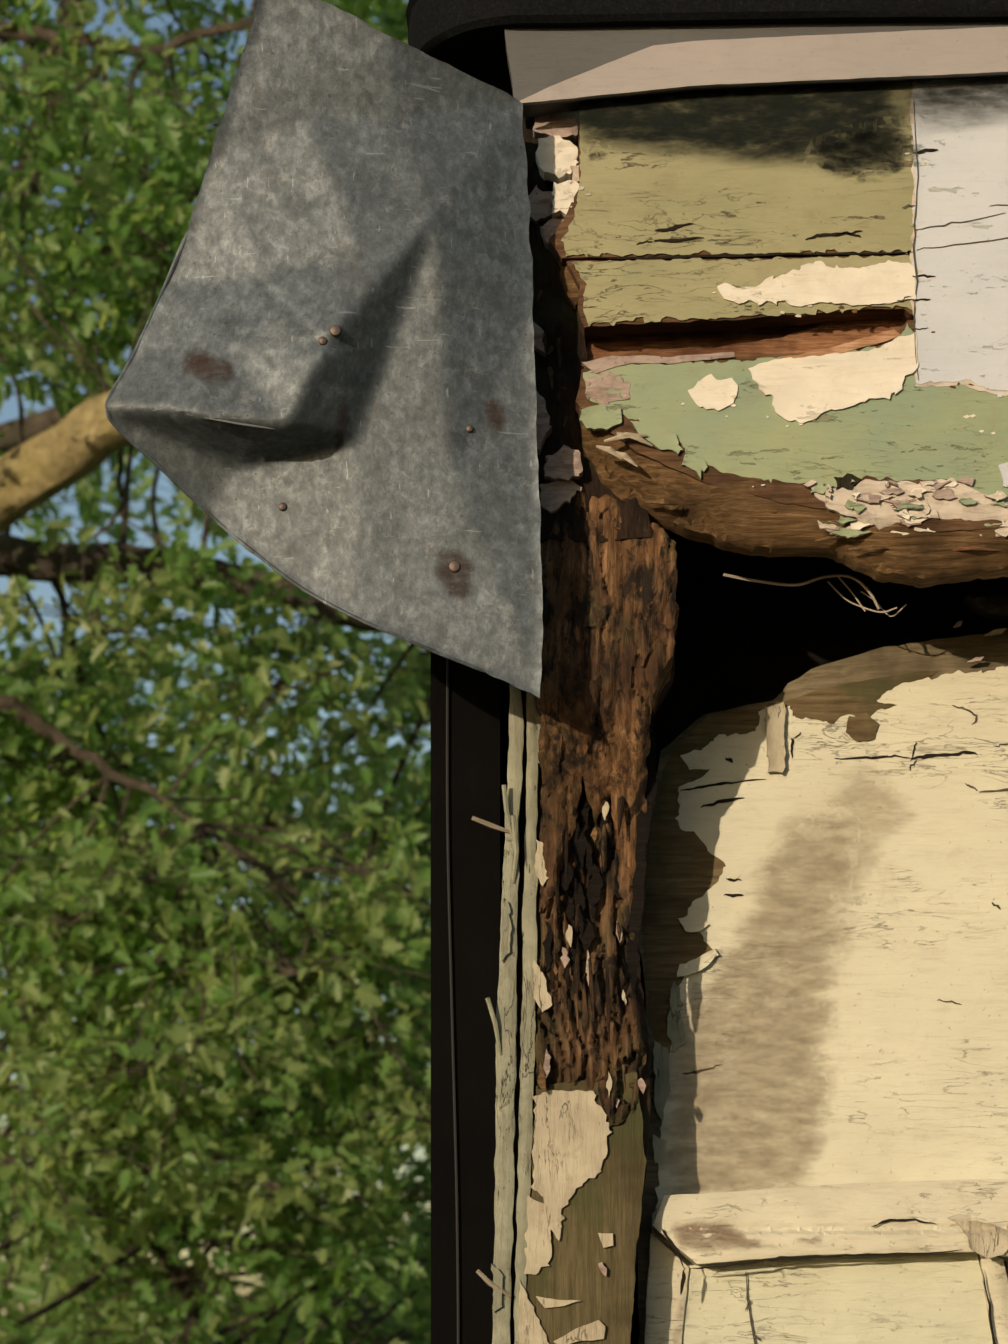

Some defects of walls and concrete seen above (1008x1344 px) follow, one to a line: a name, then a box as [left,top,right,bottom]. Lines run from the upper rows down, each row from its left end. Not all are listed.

water stain [571,83,908,170]
crack [564,108,1008,375]
peeling [528,81,1008,539]
peeling [500,898,512,962]
peeling [518,671,937,1344]
peeling [491,1263,503,1312]
crack [662,1218,996,1344]
spalling [951,1219,1008,1258]